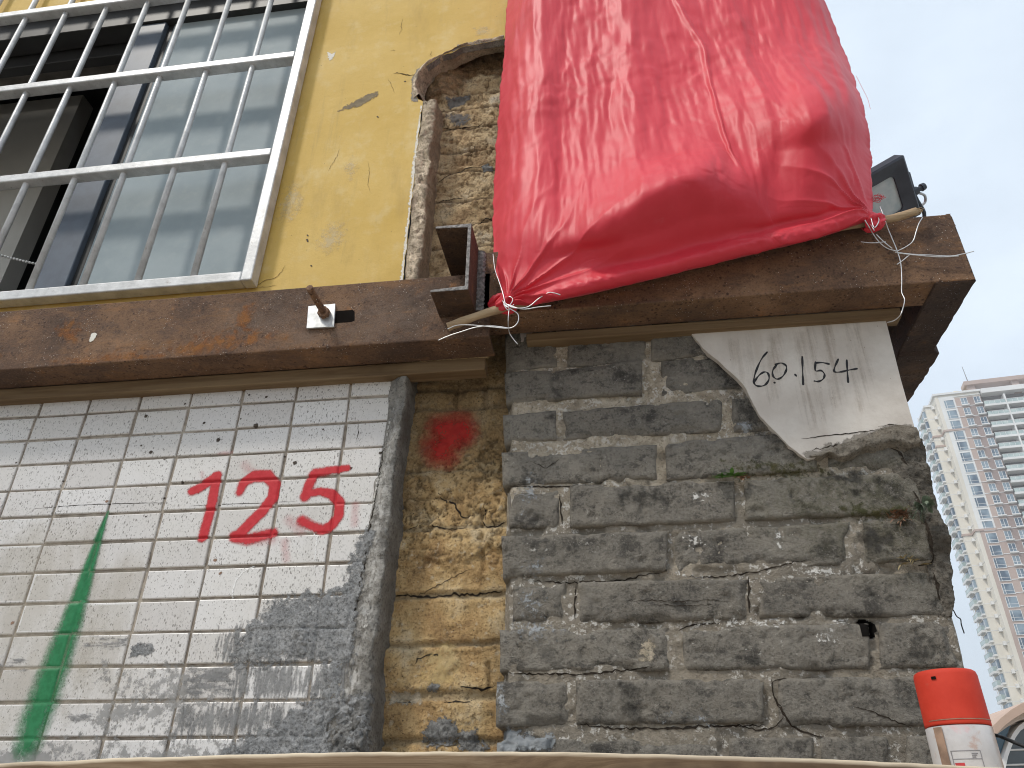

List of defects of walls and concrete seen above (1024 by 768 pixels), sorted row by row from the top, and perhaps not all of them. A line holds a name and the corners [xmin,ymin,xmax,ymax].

crack [410,493,504,530]
crack [913,491,940,600]
crack [396,569,502,598]
crack [537,560,805,630]
peeling [856,619,877,639]
crack [447,666,652,703]
crack [580,678,823,737]
crack [856,707,911,728]